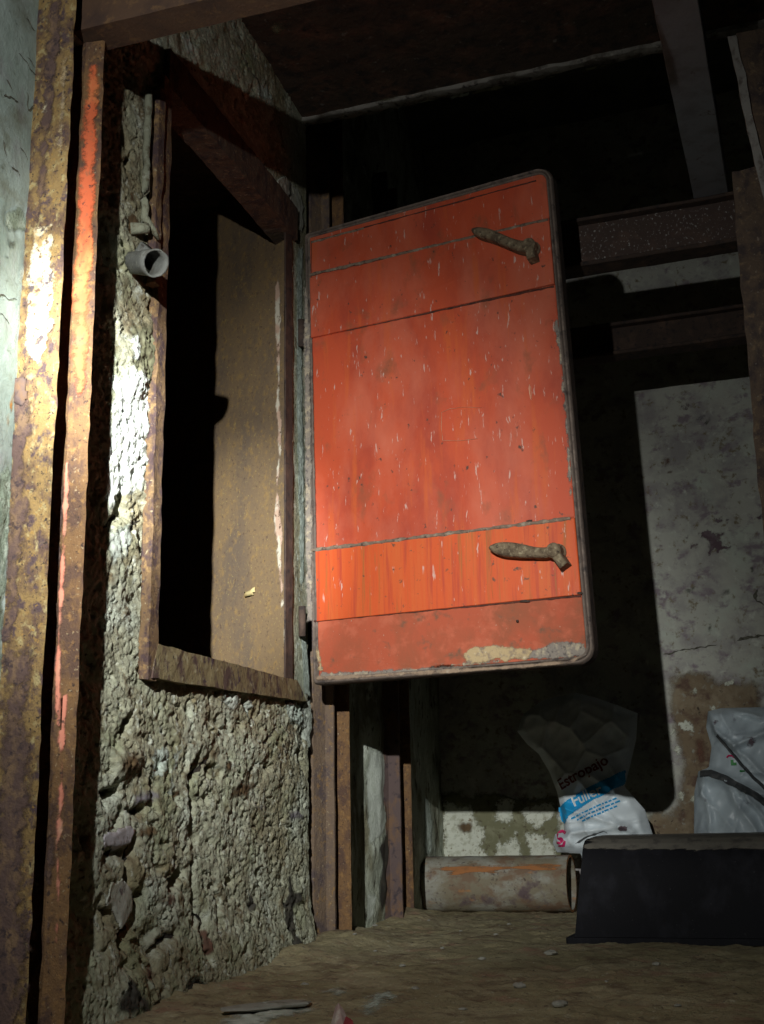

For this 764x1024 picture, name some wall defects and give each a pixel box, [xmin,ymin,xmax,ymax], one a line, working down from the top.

crack [664,634,764,655]
peeling [649,672,760,834]
peeling [442,792,562,856]